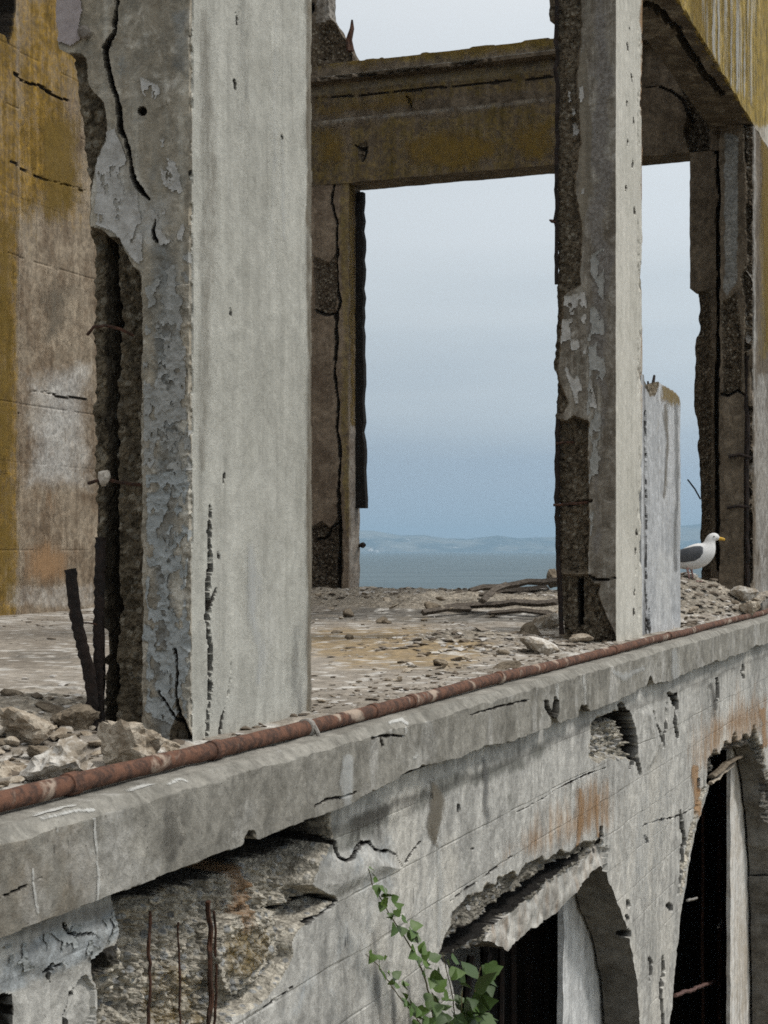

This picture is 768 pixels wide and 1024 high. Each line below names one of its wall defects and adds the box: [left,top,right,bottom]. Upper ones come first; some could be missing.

crack [13,71,68,102]
crack [101,0,159,243]
crack [642,0,726,97]
spalling [56,0,193,740]
crack [315,185,343,588]
spalling [549,0,616,642]
crack [158,505,225,739]
crack [62,923,94,937]
spalling [44,812,337,1024]
crack [266,790,421,863]
spalling [439,838,610,966]
spalling [580,704,630,765]